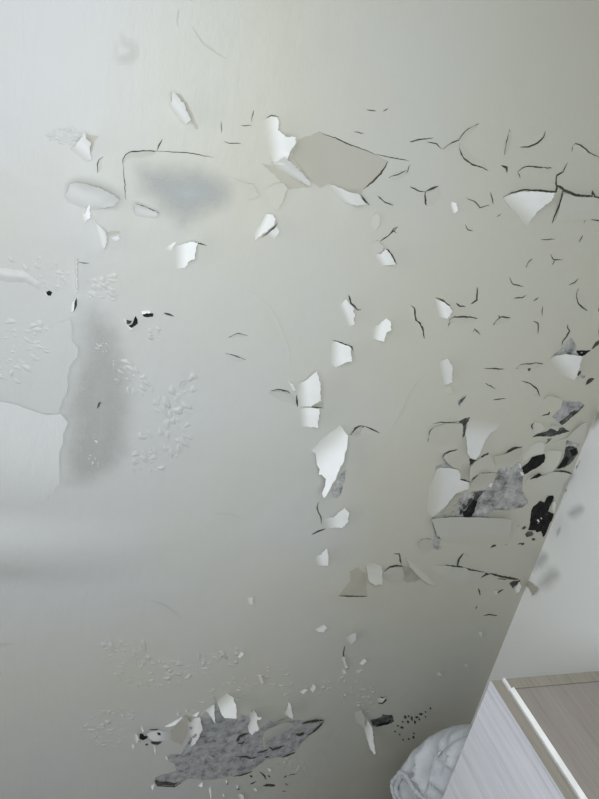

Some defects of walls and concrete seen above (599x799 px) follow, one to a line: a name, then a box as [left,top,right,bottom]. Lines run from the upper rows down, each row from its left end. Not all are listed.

crack [123,140,209,198]
peeling [265,115,407,231]
crack [389,167,501,231]
crack [410,124,598,197]
crack [509,277,543,331]
crack [570,279,599,349]
peeling [297,372,324,428]
crack [484,363,543,400]
peeling [311,425,349,535]
spalling [419,395,588,554]
spalling [132,693,324,799]
spalling [355,710,394,754]